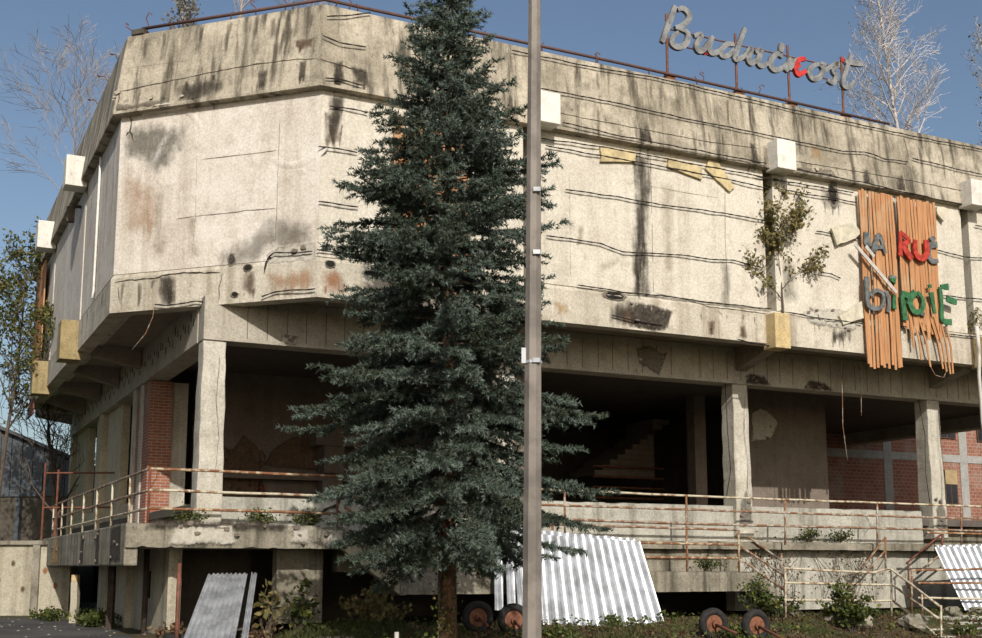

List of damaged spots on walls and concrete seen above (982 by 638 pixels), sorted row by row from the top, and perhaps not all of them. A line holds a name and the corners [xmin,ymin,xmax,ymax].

leakage [278,14,296,44]
leakage [181,75,222,100]
leakage [335,62,368,90]
leakage [328,97,343,143]
leakage [129,129,178,166]
leakage [615,155,650,321]
spalling [603,291,672,330]